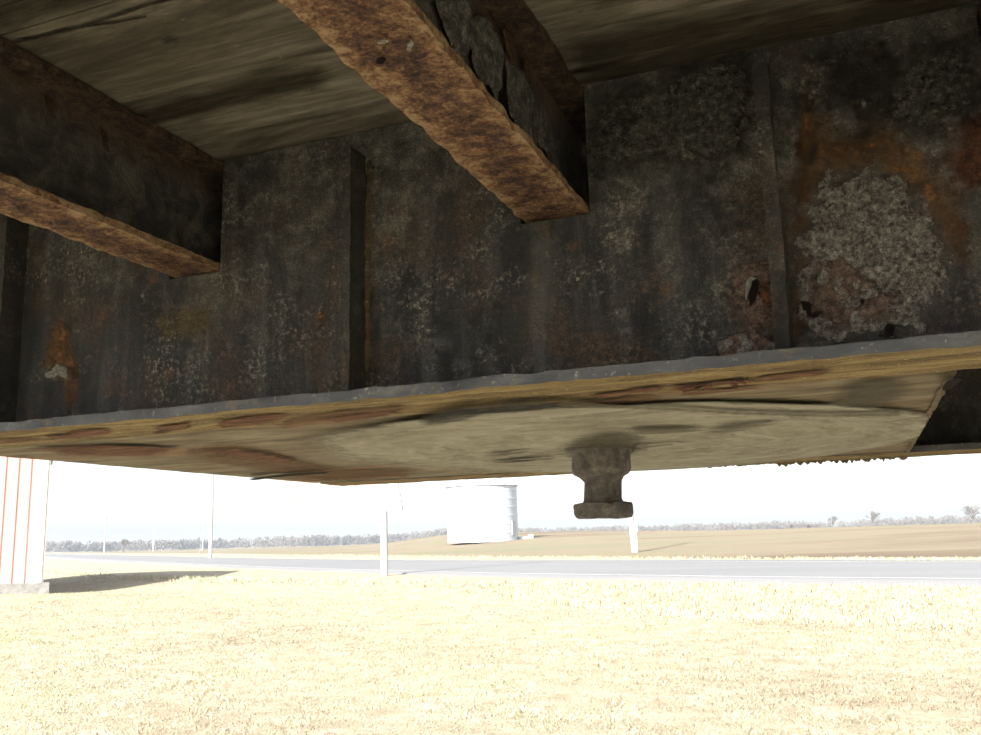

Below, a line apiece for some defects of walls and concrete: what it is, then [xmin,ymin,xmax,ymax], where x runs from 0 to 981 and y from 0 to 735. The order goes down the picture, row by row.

peeling [436,0,554,156]
peeling [790,157,958,344]
corrosion [44,323,79,407]